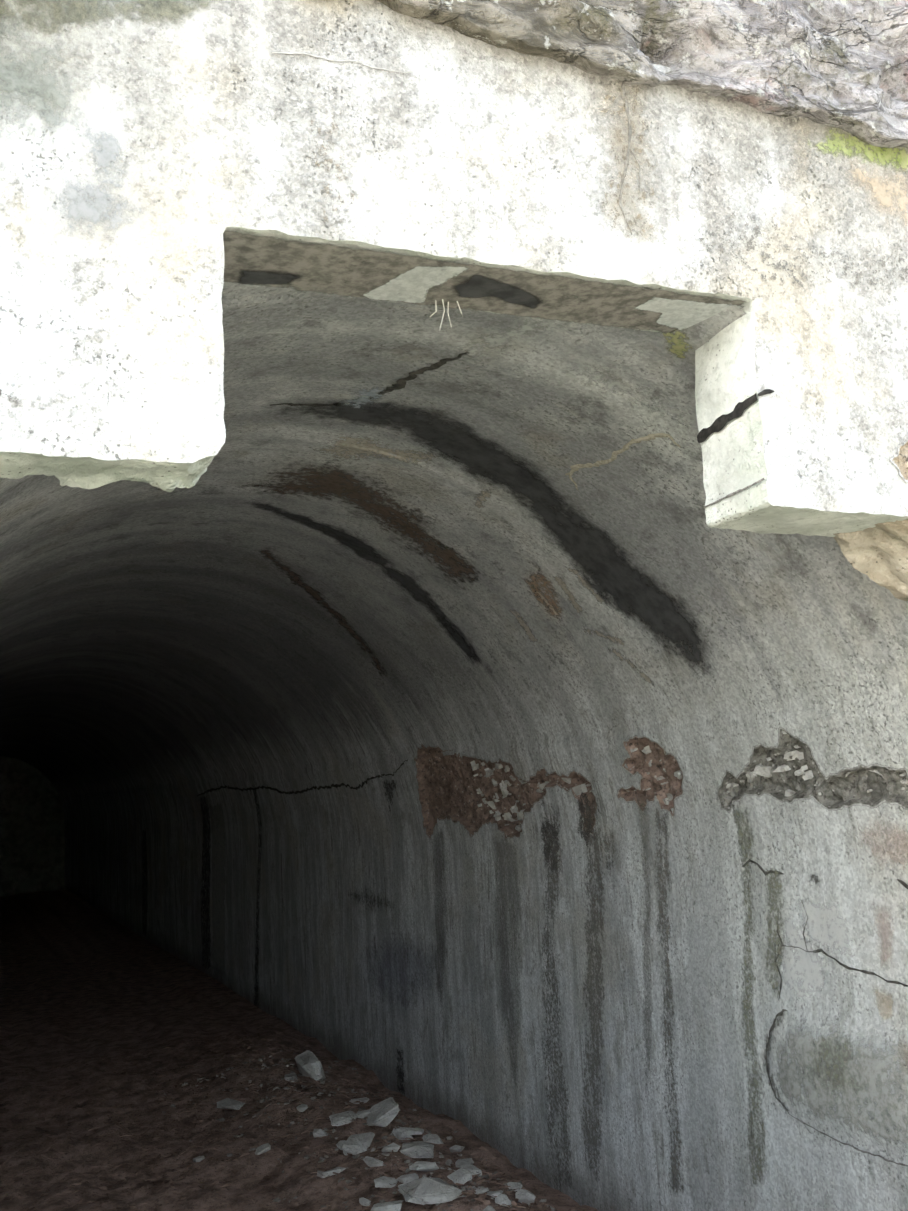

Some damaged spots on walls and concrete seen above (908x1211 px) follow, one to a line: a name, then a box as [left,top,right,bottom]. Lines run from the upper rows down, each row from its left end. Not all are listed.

crack [269,352,470,407]
crack [565,389,774,491]
spalling [890,438,908,483]
leakage [245,387,709,674]
crack [198,760,408,796]
spalling [414,743,597,840]
spalling [616,735,684,818]
spalling [717,727,908,813]
crack [742,859,908,999]
leakage [541,792,613,1192]
leakage [656,809,684,1192]